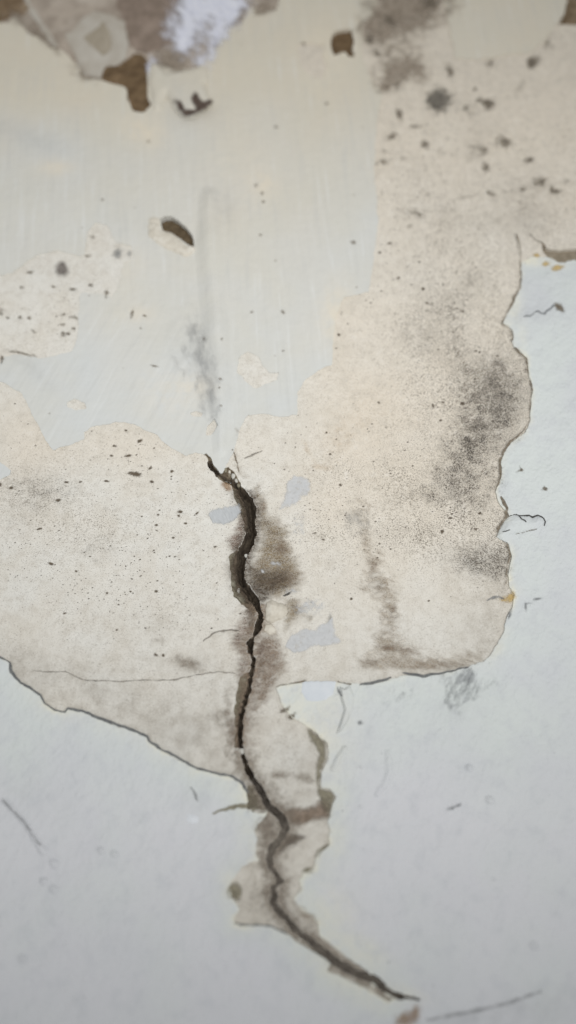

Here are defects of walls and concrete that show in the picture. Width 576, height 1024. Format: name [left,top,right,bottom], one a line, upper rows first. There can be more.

spalling [0,0,218,120]
leakage [359,0,449,90]
peeling [0,223,134,362]
peeling [148,217,195,257]
peeling [226,0,576,971]
leakage [412,357,521,508]
peeling [0,382,258,794]
leakage [234,487,301,710]
leakage [459,546,508,580]
crack [43,449,420,1000]
leakage [274,730,334,855]